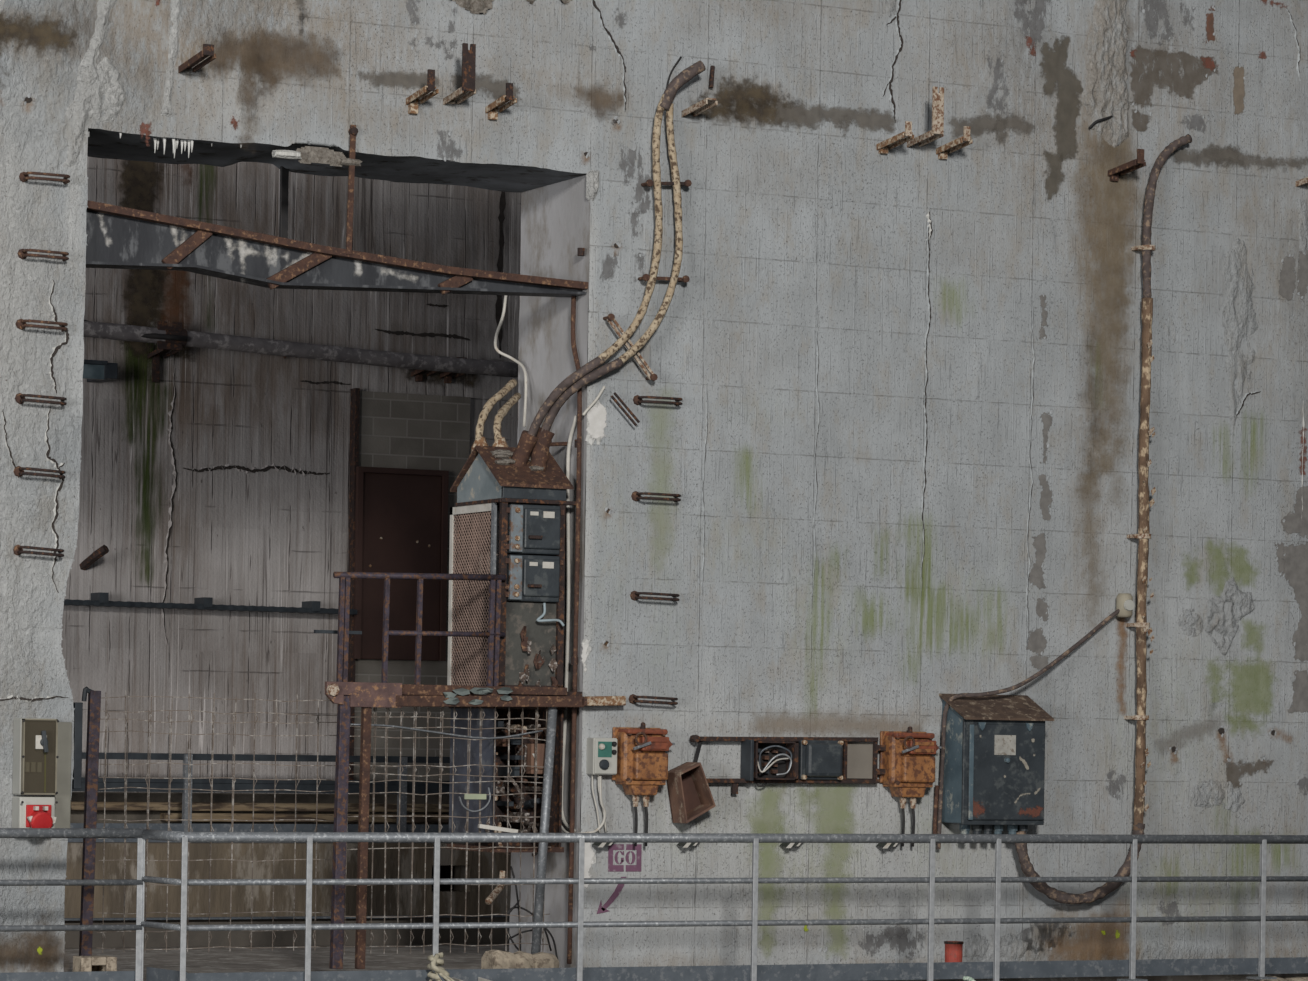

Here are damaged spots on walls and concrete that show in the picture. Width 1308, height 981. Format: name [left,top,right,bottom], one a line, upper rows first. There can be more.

damp [0,17,75,54]
spalling [406,0,494,60]
crack [592,0,627,111]
damp [691,77,895,132]
crack [882,0,903,123]
peeling [1130,0,1246,133]
crack [2,410,19,479]
crack [44,279,69,593]
crack [921,208,933,597]
crack [161,368,330,645]
peeling [1274,486,1308,715]
crack [0,694,68,702]